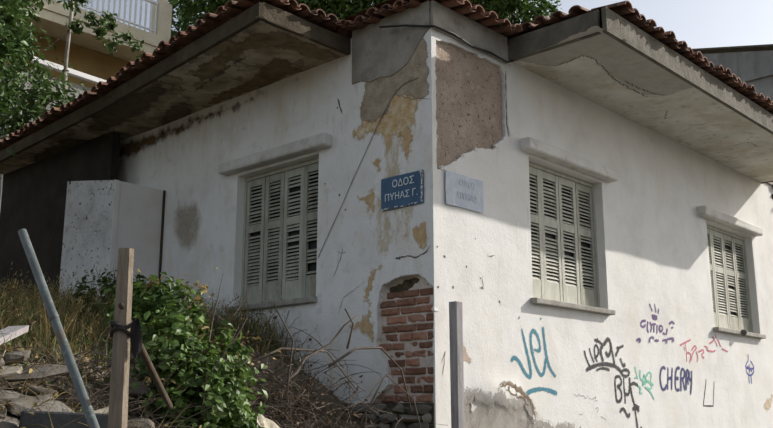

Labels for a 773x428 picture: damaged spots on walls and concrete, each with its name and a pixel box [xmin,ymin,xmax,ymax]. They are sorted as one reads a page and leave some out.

water stain [158,102,192,127]
spalling [349,39,520,171]
crack [537,55,670,119]
peeling [358,189,375,213]
peeling [413,221,428,249]
flaking render [350,265,439,403]
peeling [464,387,581,428]